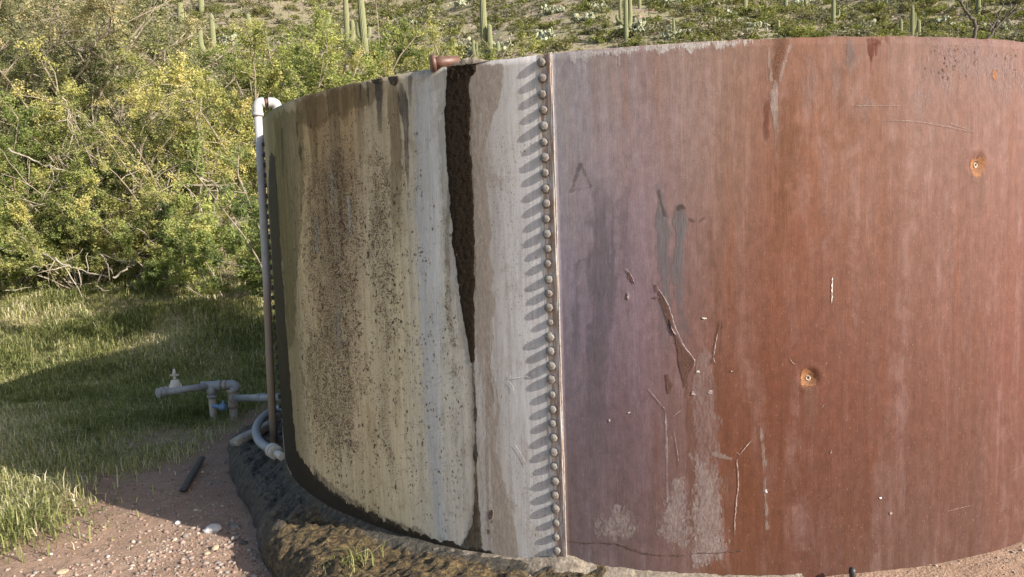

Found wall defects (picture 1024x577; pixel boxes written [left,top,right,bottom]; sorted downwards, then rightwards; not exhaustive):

corrosion [771,38,789,82]
corrosion [868,38,881,62]
damp [268,57,519,558]
peeling [654,284,712,395]